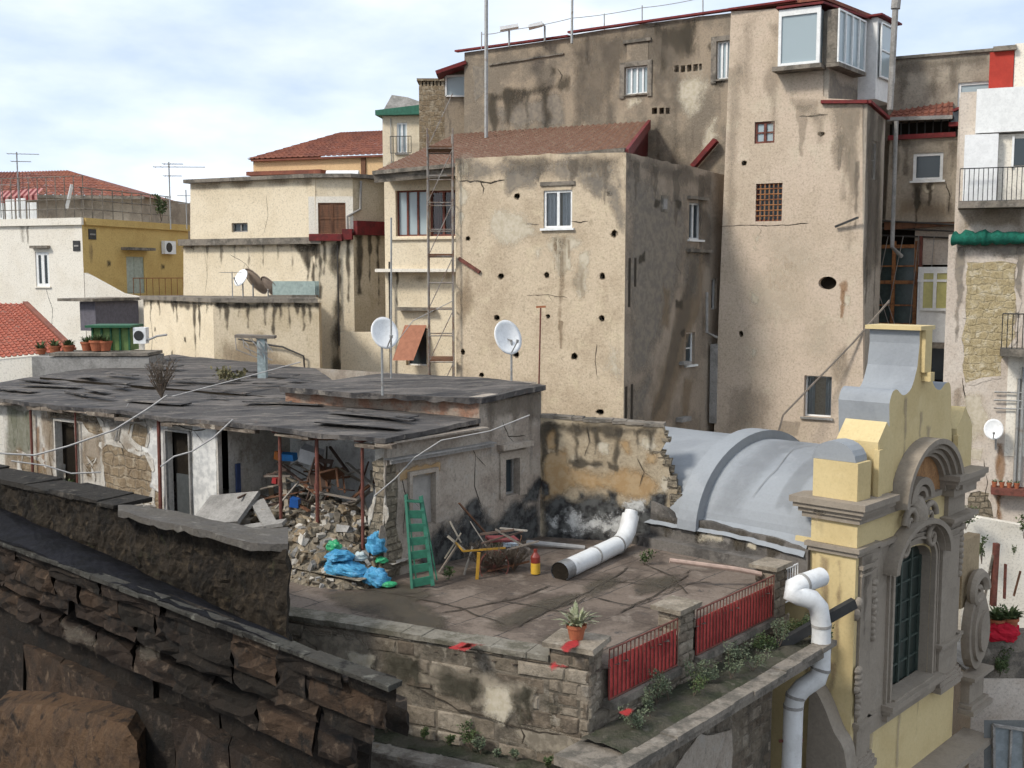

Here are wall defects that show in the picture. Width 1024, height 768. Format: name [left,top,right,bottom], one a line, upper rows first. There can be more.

crack [461,180,504,192]
leakage [144,235,379,370]
spalling [960,258,1022,386]
spalling [47,411,165,509]
peeling [540,429,682,507]
leakage [420,478,673,566]
crack [356,563,711,627]